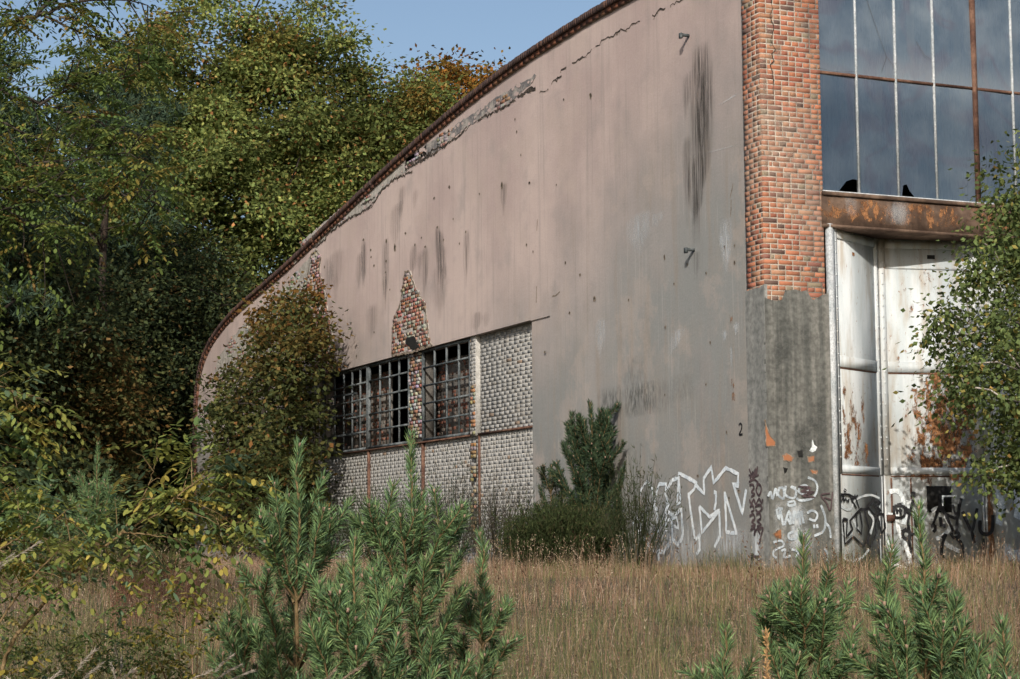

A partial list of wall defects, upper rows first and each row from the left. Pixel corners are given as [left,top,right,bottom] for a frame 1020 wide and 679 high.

crack [769,0,777,95]
crack [313,0,682,248]
leakage [686,55,709,214]
flaking render [213,74,536,396]
corrosion [821,199,958,228]
corrosion [842,386,869,467]
corrosion [905,372,976,487]